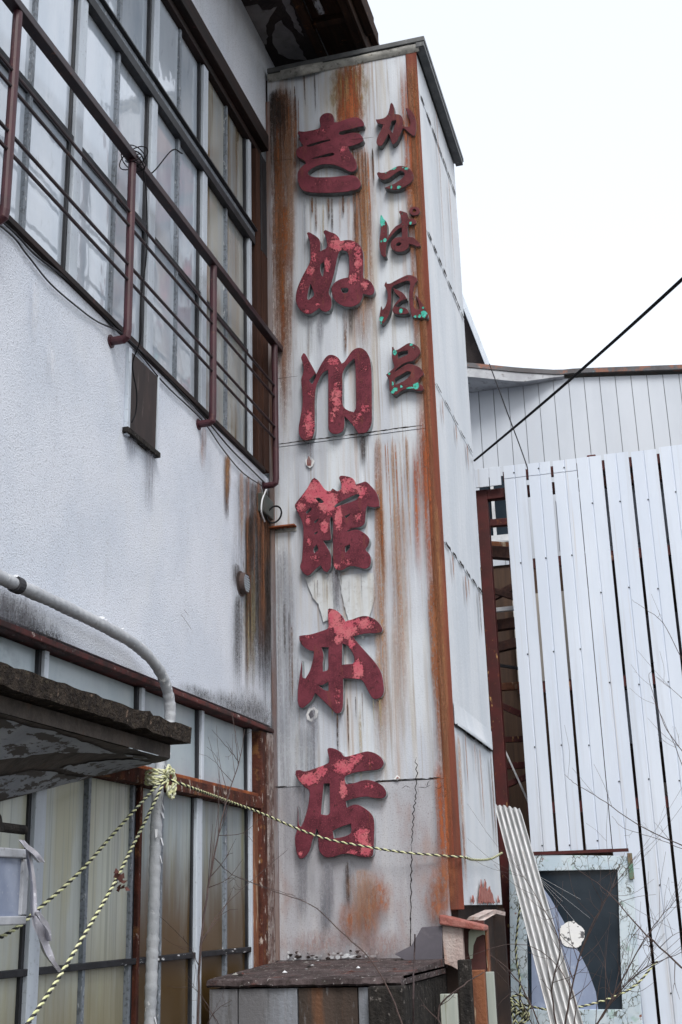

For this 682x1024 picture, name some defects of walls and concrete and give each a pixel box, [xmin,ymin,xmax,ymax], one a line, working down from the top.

peeling [245,0,307,60]
corrosion [332,64,367,121]
corrosion [272,92,300,380]
corrosion [352,147,374,282]
corrosion [375,68,496,918]
damp [187,486,317,771]
peeling [0,719,152,800]
damp [332,696,381,753]
crack [375,757,443,946]
peeling [471,879,500,905]